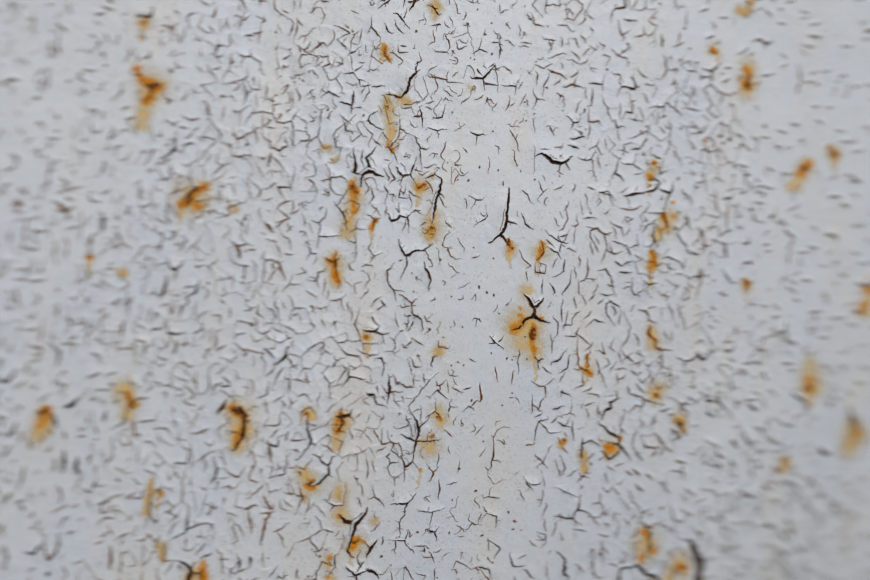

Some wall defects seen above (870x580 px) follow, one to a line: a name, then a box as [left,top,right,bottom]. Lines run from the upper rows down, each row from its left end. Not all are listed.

crack [1,78,19,94]
corrosion [133,66,166,130]
corrosion [740,60,756,98]
crack [488,119,535,171]
corrosion [176,182,210,225]
corrosion [339,180,362,238]
crack [464,182,534,243]
corrosion [505,286,544,381]
corrosion [31,405,53,440]
crack [0,291,103,580]
corrosion [226,402,253,454]
crack [452,538,549,580]